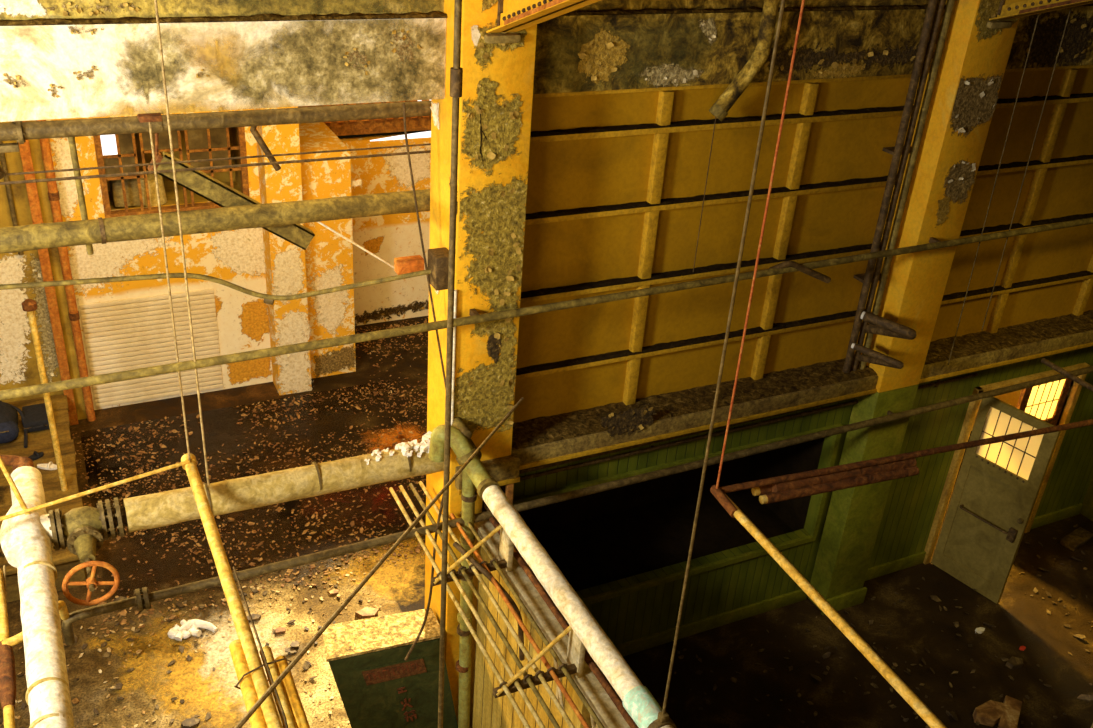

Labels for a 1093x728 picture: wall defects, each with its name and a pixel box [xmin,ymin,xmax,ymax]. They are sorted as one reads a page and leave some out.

peeling [0,0,139,35]
peeling [482,0,498,11]
leakage [121,33,195,102]
leakage [207,19,446,106]
peeling [950,73,1003,137]
peeling [377,142,431,190]
spalling [936,160,976,226]
peeling [454,20,528,436]
spalling [0,237,176,385]
peeling [209,228,439,395]